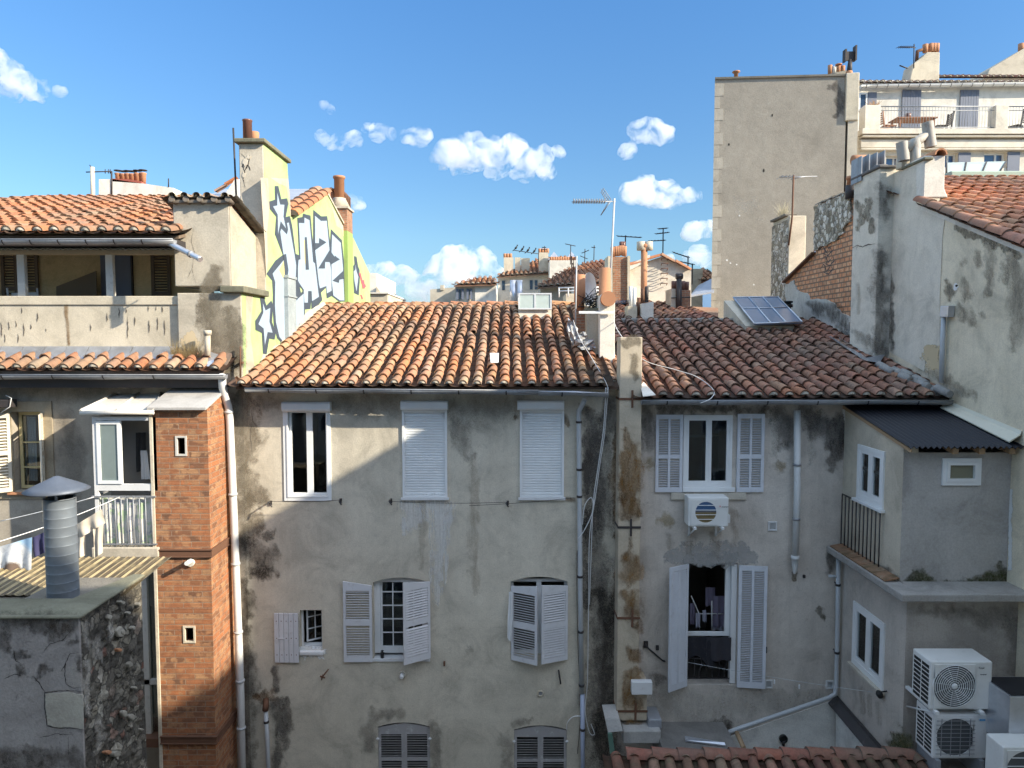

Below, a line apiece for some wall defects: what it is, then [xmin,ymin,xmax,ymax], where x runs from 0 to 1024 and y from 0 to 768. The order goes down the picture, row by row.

damp [855,185,889,234]
damp [869,251,894,357]
damp [954,225,1022,308]
corrosion [608,427,644,520]
damp [233,390,279,768]
damp [582,398,619,768]
corrosion [612,552,644,632]
crack [6,631,79,754]
corrosion [622,648,643,725]